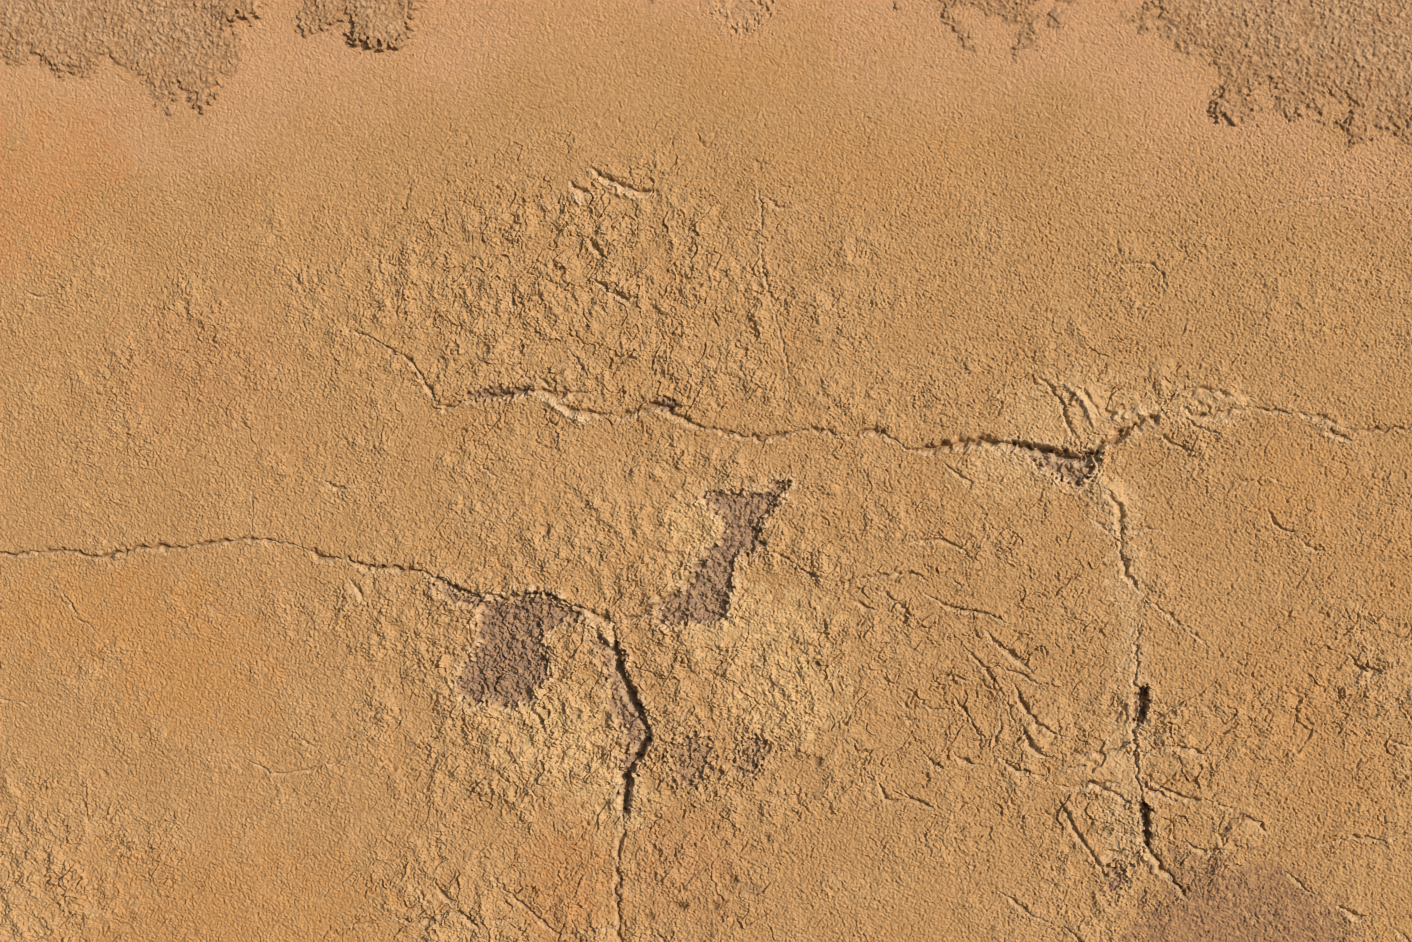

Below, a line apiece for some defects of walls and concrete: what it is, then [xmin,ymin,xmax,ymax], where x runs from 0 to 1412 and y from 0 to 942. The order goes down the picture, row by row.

flaking render [0,0,269,126]
flaking render [291,0,428,56]
peeling [700,0,789,53]
flaking render [934,0,1079,64]
flaking render [1115,0,1412,156]
flaking render [569,190,585,207]
flaking render [601,179,643,204]
crack [308,469,361,494]
spalling [641,462,803,641]
crack [341,164,1412,942]
crack [0,483,716,942]
spalling [420,564,792,831]